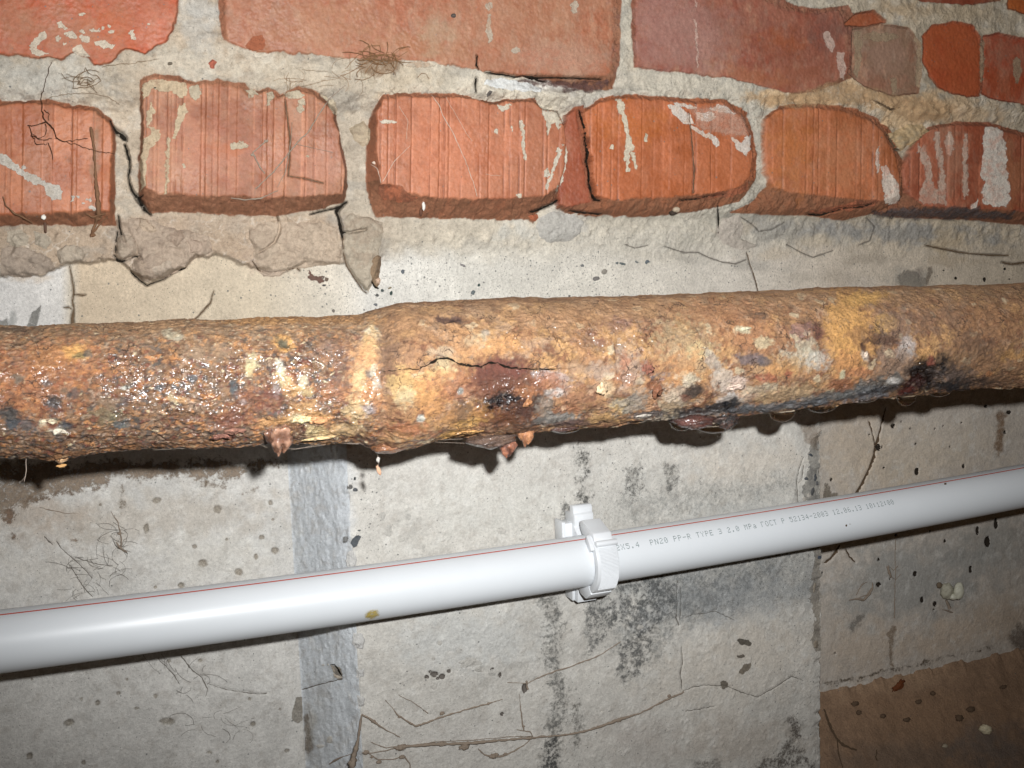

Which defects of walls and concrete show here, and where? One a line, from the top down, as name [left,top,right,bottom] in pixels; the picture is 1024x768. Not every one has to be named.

crack [110,121,186,286]
spalling [308,270,329,286]
crack [310,202,367,293]
spalling [378,184,418,203]
crack [530,111,602,215]
water stain [586,580,672,682]
water stain [540,597,564,768]